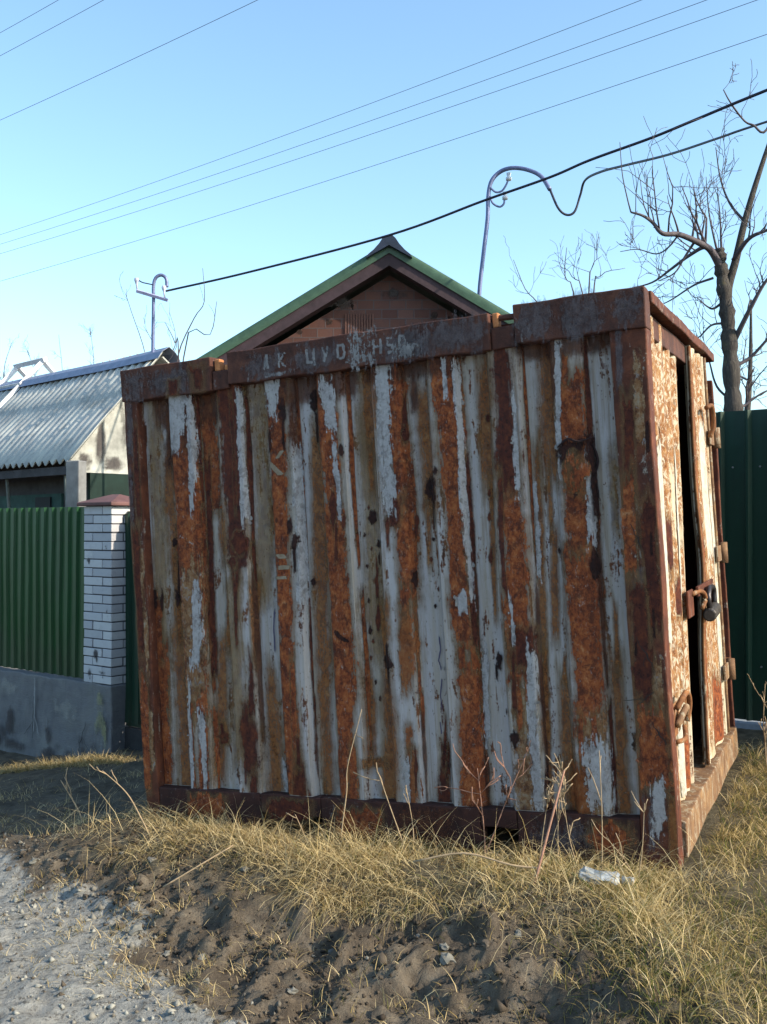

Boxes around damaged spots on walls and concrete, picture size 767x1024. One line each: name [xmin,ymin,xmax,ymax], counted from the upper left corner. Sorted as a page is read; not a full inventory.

peeling [120,363,201,527]
peeling [234,386,253,529]
peeling [245,312,489,616]
peeling [510,285,682,645]
corrosion [691,351,715,585]
peeling [187,579,208,789]
corrosion [132,316,691,865]
corrosion [705,606,724,754]
peeling [642,774,667,856]